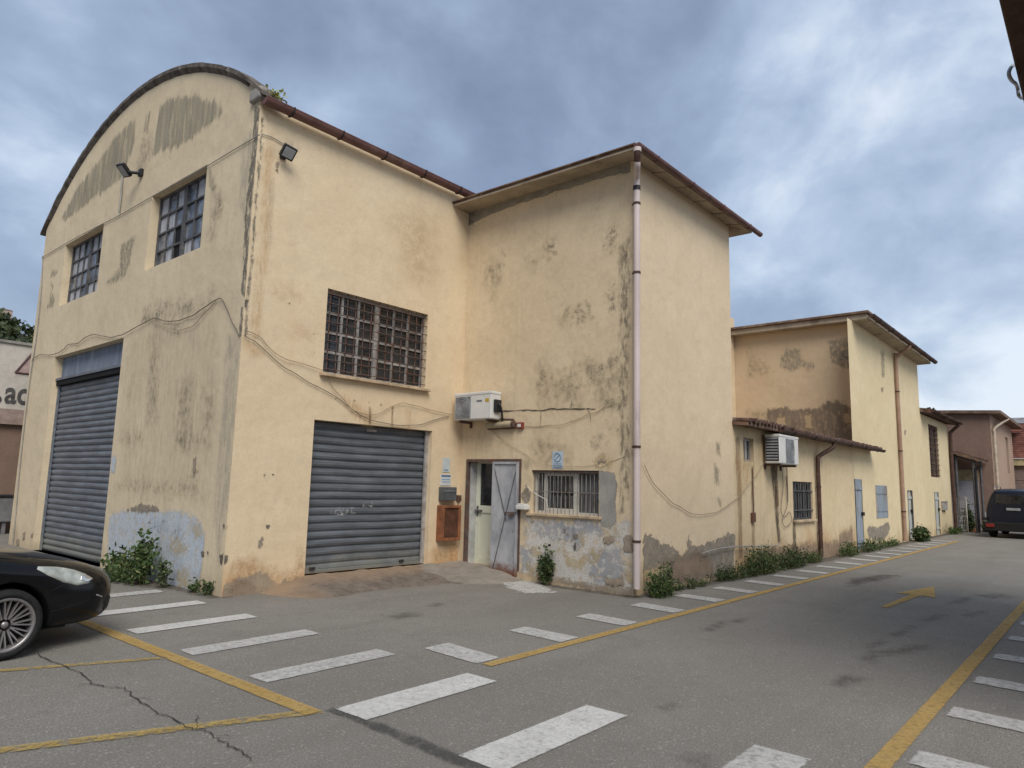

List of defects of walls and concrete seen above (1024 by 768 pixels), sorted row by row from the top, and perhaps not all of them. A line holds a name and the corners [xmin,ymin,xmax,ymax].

peeling [828,340,849,368]
peeling [767,401,852,440]
peeling [107,502,228,589]
peeling [519,488,736,594]
crack [38,653,251,760]